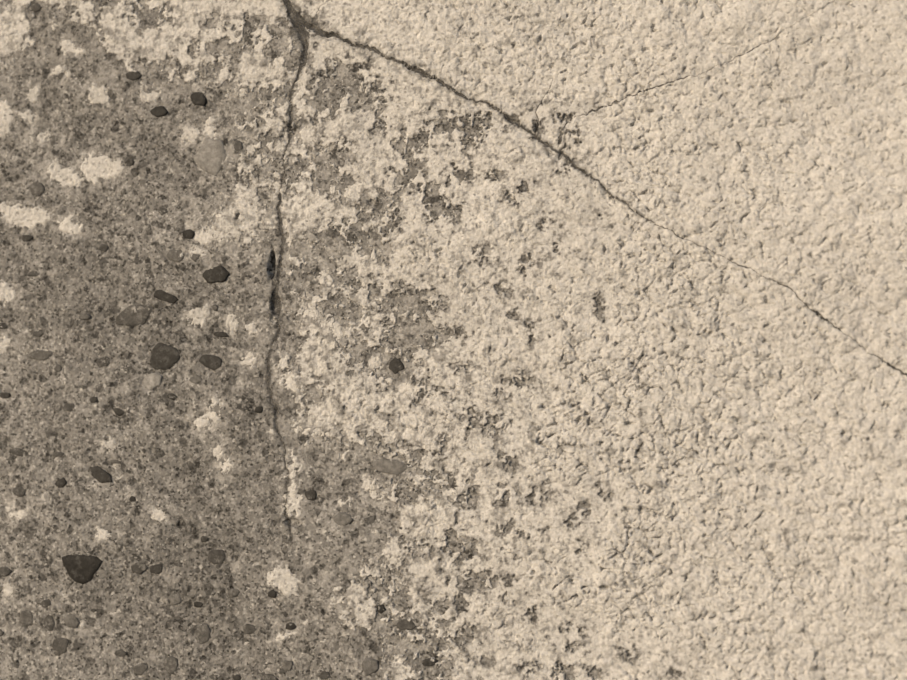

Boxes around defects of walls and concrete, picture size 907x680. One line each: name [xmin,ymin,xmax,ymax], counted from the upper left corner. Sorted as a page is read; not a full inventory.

peeling [503,101,582,174]
peeling [498,181,539,207]
peeling [518,254,540,277]
crack [266,0,907,546]
peeling [593,292,605,322]
peeling [0,0,517,680]
peeling [506,308,535,343]
peeling [494,370,536,400]
peeling [457,388,554,562]
peeling [565,500,591,530]
peeling [551,622,602,680]